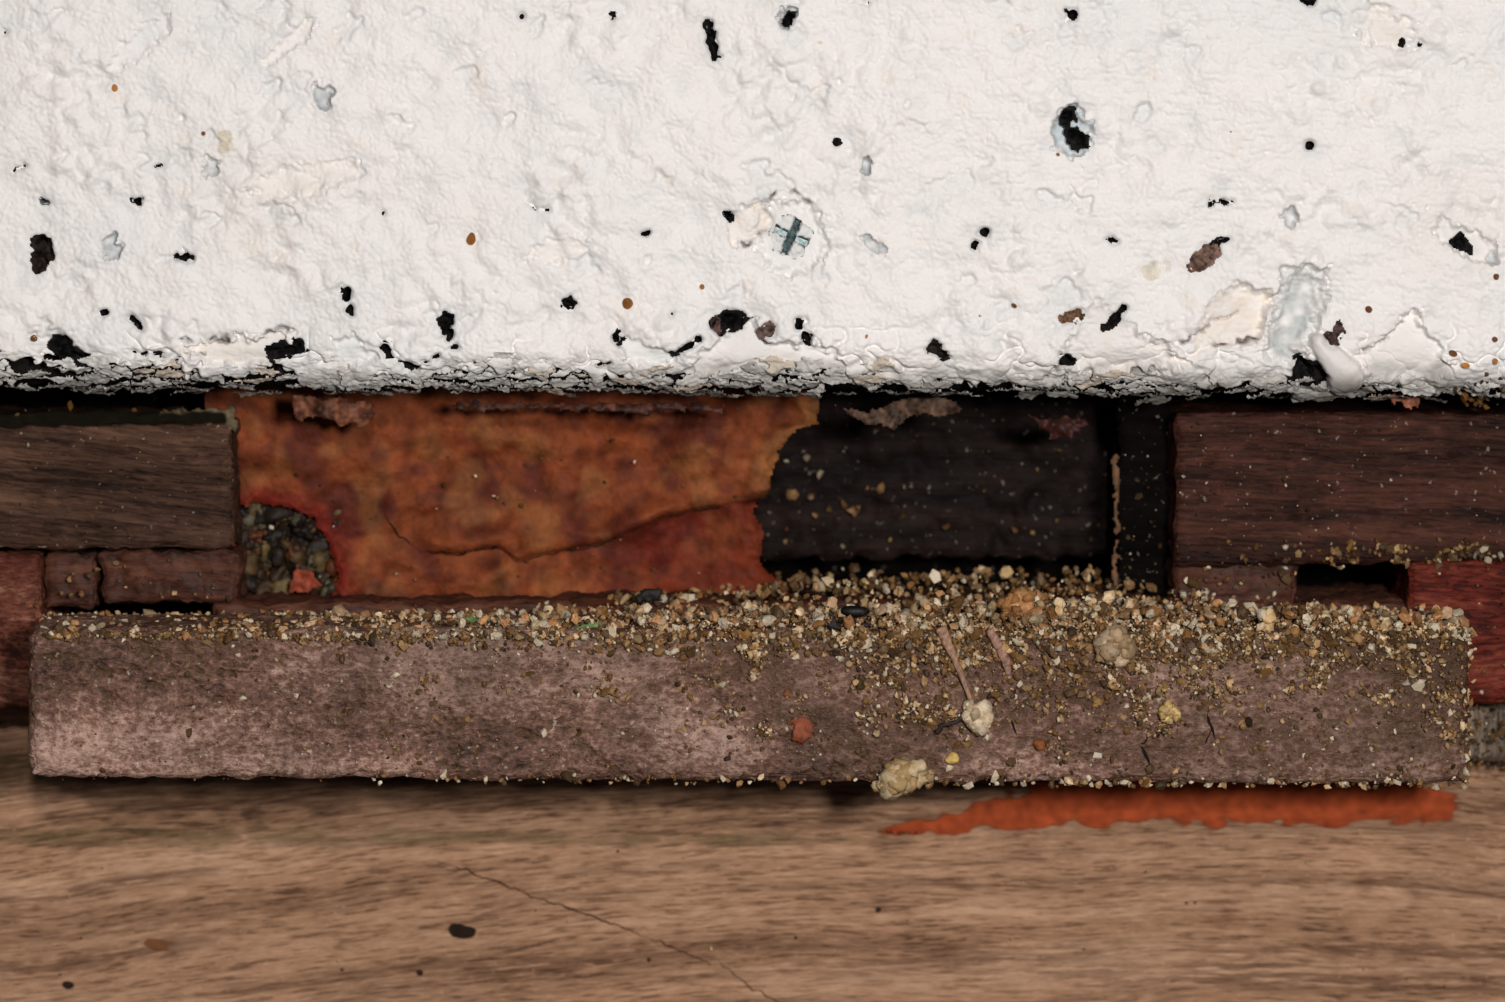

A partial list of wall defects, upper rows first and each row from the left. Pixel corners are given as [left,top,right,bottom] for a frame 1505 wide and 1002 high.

crack [385,505,733,563]
peeling [288,565,322,593]
crack [439,862,779,1002]